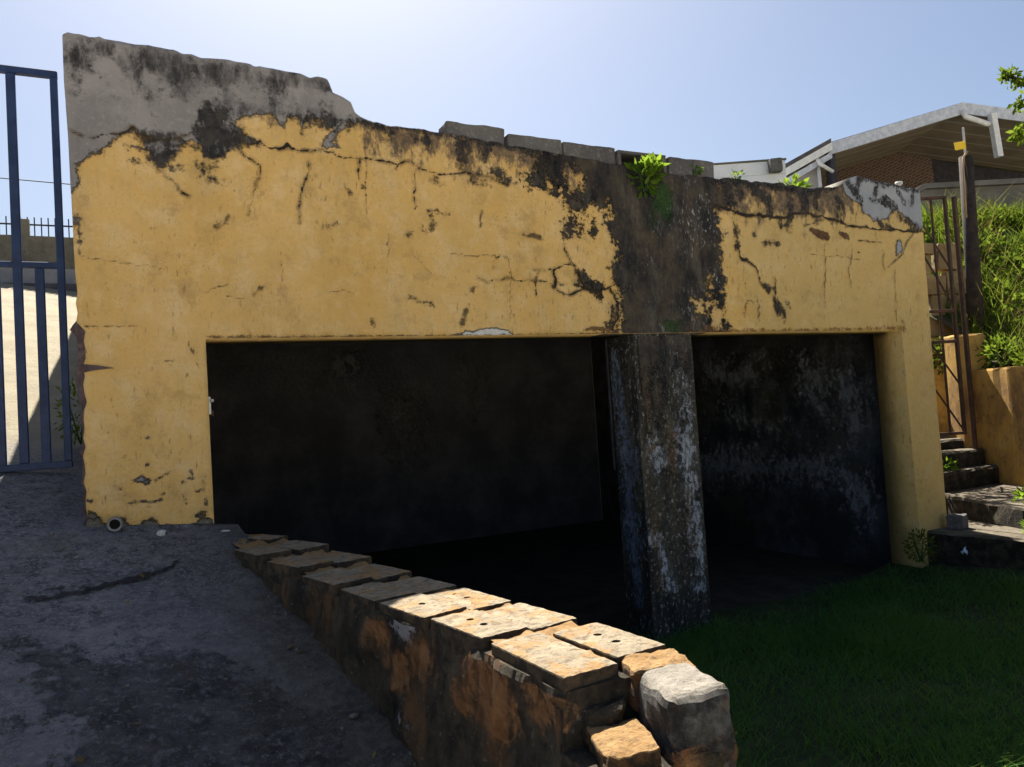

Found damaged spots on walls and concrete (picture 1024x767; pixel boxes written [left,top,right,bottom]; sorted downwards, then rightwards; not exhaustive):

leakage [130,46,240,96]
leakage [136,99,260,181]
peeling [62,32,367,194]
leakage [260,71,298,92]
crack [241,137,517,218]
peeling [843,176,923,230]
crack [454,246,620,331]
leakage [289,111,921,457]
crack [715,204,924,322]
spalling [451,327,514,336]
peeling [132,463,169,486]
crack [24,559,180,601]